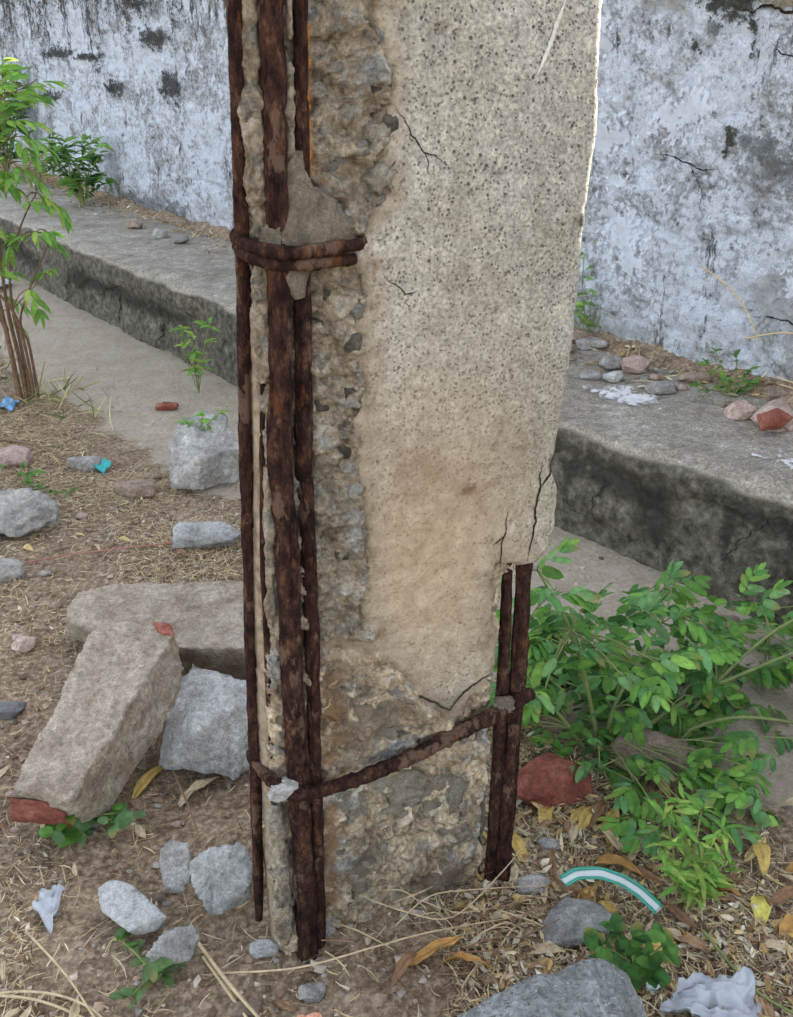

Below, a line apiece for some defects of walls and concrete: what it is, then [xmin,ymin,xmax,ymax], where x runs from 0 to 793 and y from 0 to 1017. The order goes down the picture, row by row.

leakage [0,0,182,99]
leakage [155,68,184,109]
spalling [225,0,399,246]
corrosion [307,85,324,186]
leakage [695,0,762,60]
leakage [772,17,793,70]
leakage [103,185,191,218]
spalling [235,255,533,922]
crack [495,514,508,564]
crack [527,461,660,562]
spalling [278,707,523,963]